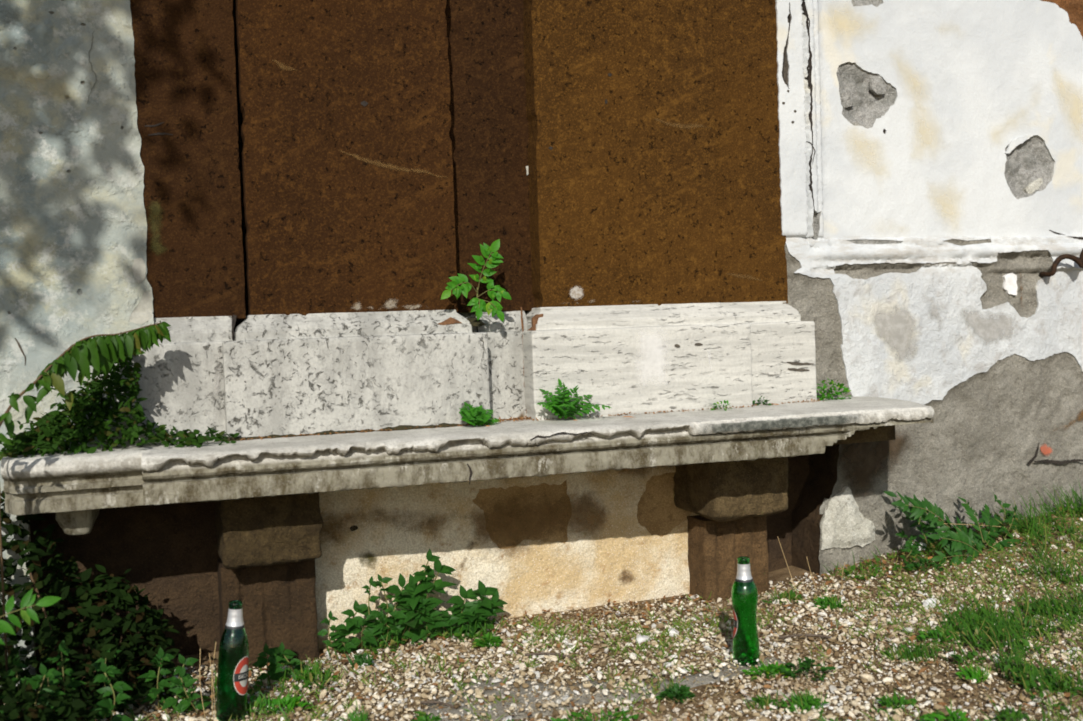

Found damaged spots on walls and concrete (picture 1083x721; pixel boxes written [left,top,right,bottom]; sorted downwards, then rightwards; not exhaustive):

flaking render [1041,0,1083,38]
crack [782,0,816,210]
spalling [836,62,897,134]
spalling [1004,135,1054,199]
flaking render [971,250,1053,318]
flaking render [819,352,1083,576]